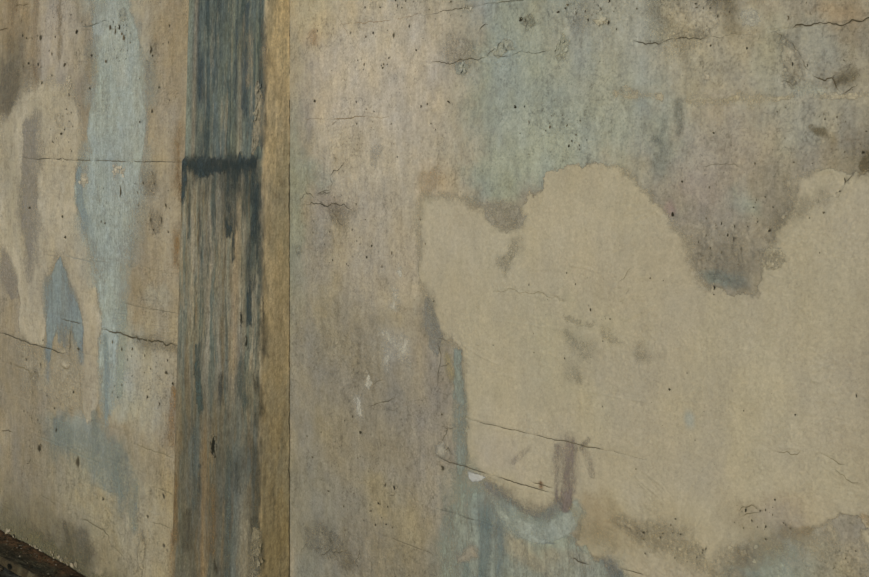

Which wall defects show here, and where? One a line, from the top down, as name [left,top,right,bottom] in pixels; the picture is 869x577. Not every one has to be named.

crack [431,43,545,65]
crack [636,17,869,93]
leakage [181,67,267,351]
crack [103,329,174,346]
leakage [193,343,203,414]
crack [288,163,372,574]
leakage [440,475,621,577]